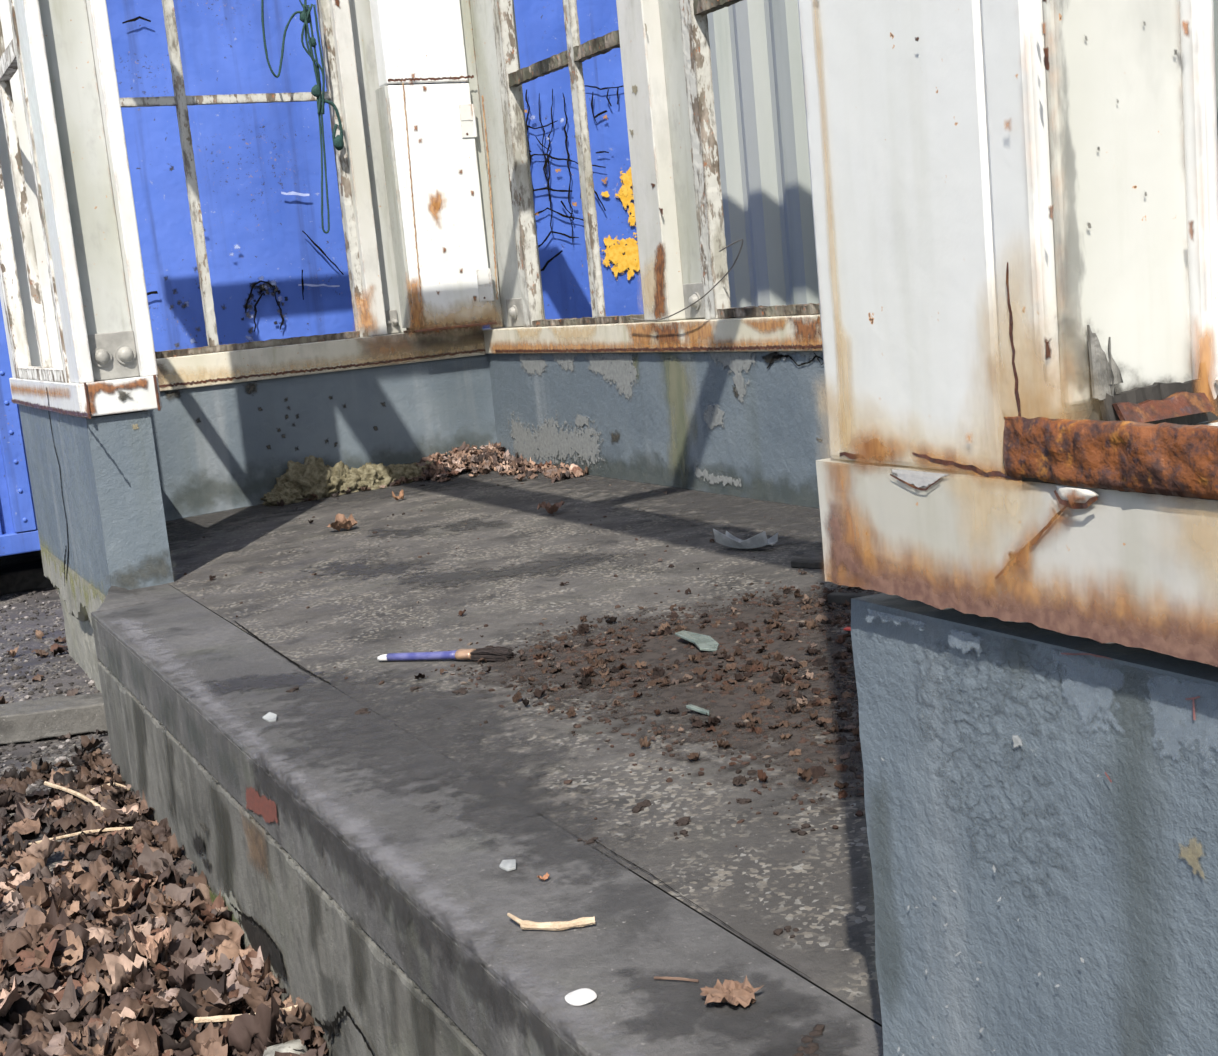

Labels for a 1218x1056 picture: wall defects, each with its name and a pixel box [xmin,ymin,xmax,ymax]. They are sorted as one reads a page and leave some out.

rust [11,244,823,418]
peeling [519,353,639,402]
peeling [710,351,823,403]
peeling [508,411,605,468]
peeling [695,466,741,487]
rust [828,463,1218,667]